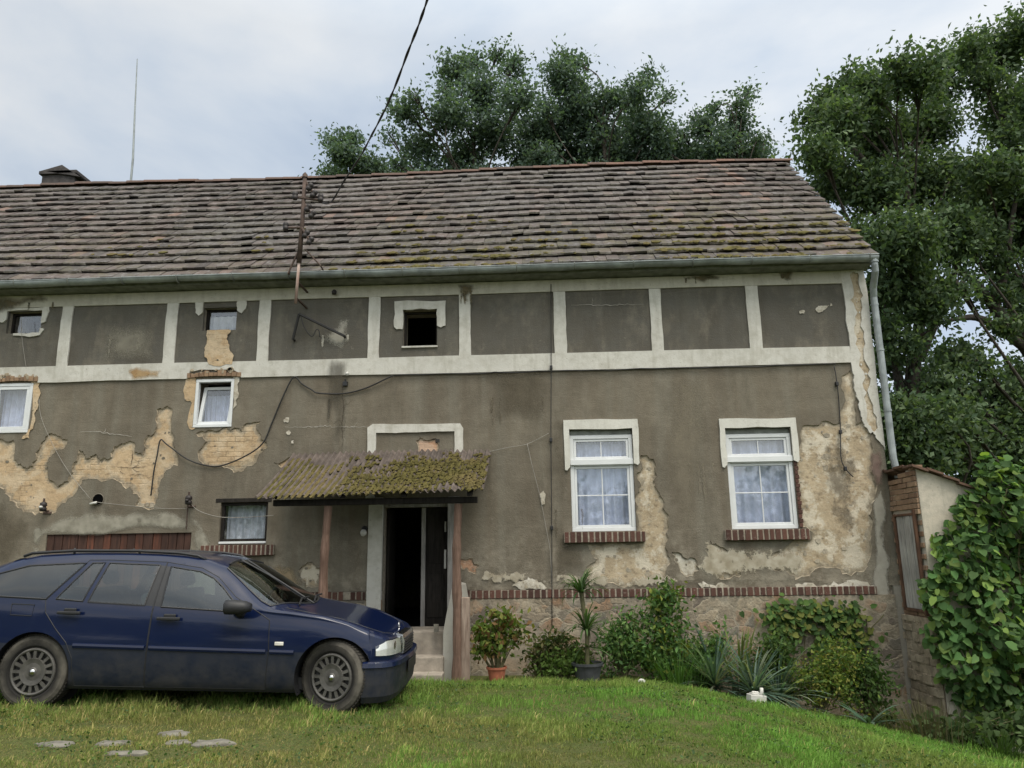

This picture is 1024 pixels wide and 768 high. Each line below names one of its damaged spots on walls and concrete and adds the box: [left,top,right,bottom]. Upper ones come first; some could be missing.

flaking render [0,374,179,515]
flaking render [183,329,267,473]
spalling [416,437,440,452]
flaking render [771,272,878,587]
flaking render [298,562,320,588]
peeling [513,577,546,590]
flaking render [585,455,742,588]